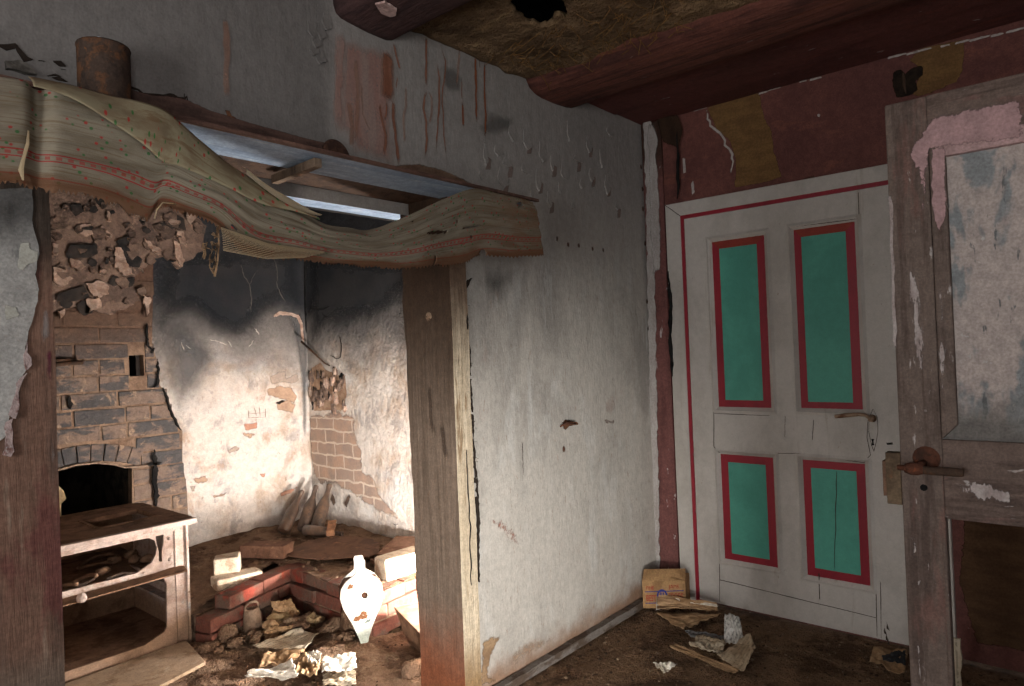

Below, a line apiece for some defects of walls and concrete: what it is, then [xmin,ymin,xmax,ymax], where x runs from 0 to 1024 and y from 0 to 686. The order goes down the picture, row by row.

corrosion [379,45,407,160]
corrosion [423,39,446,154]
corrosion [461,59,487,134]
peeling [696,87,781,187]
peeling [888,27,1024,96]
peeling [0,188,206,457]
flaking render [267,363,398,526]
crack [466,313,481,582]